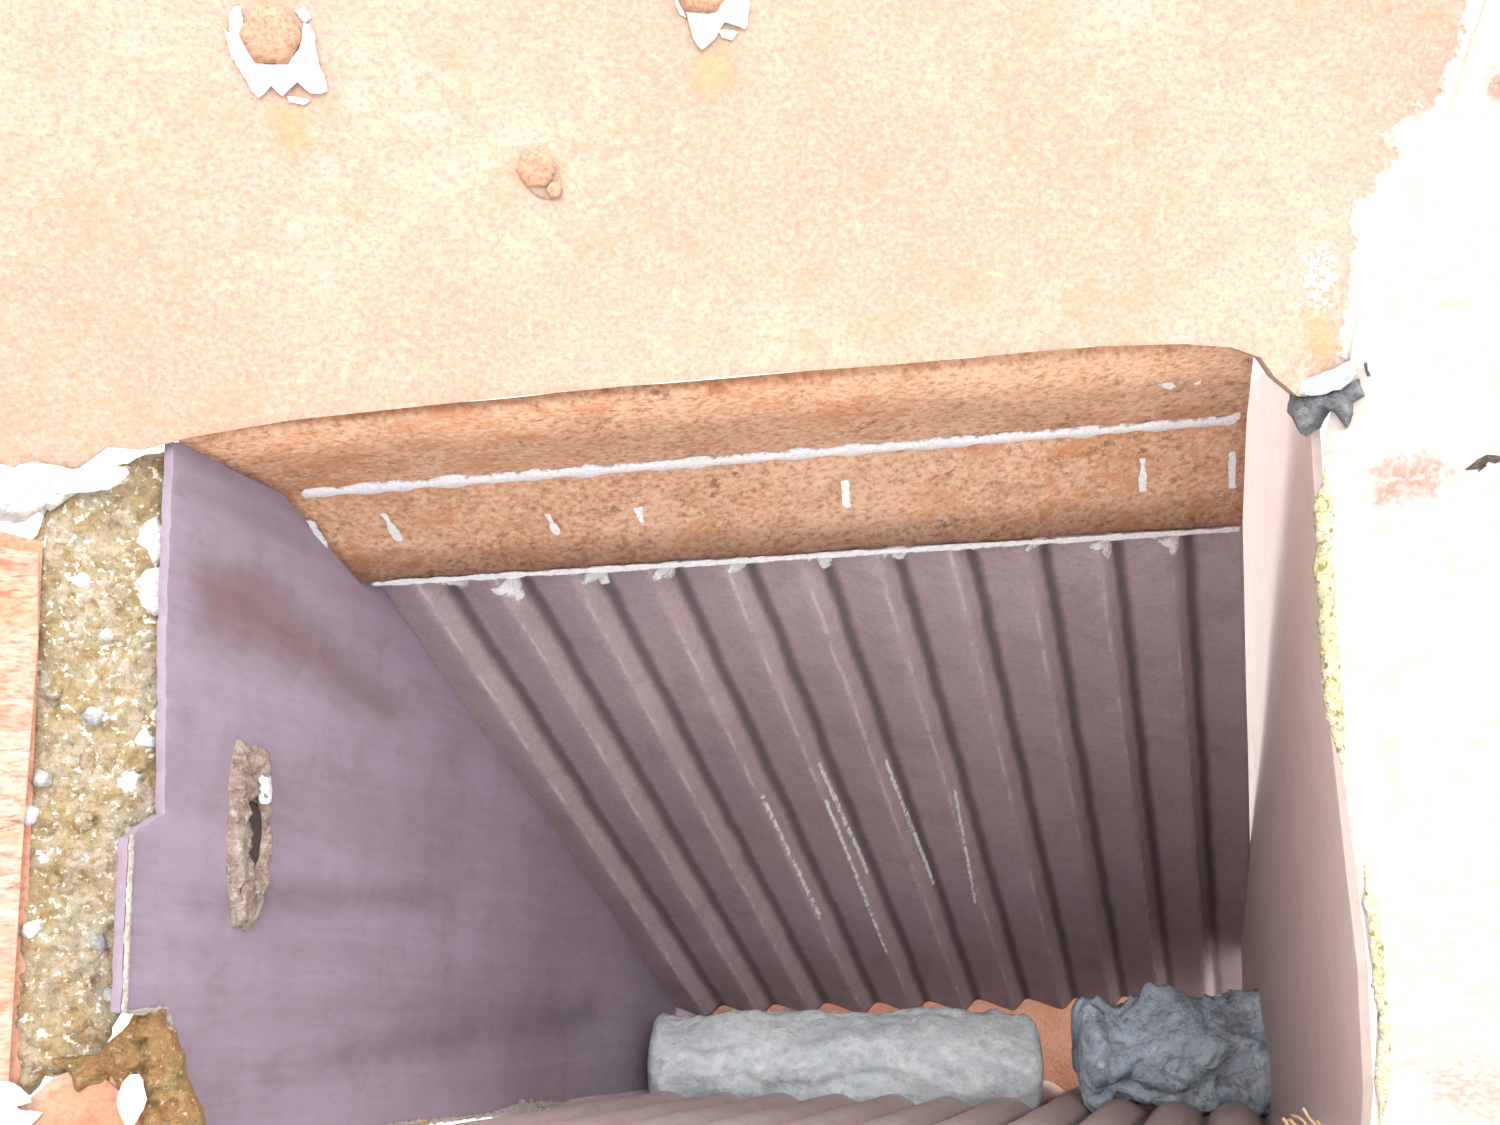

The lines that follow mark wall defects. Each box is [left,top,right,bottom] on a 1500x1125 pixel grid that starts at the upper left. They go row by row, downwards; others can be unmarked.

peeling [224,6,327,105]
peeling [675,0,750,50]
peeling [1287,0,1487,437]
spalling [0,452,164,1125]
peeling [258,775,272,805]